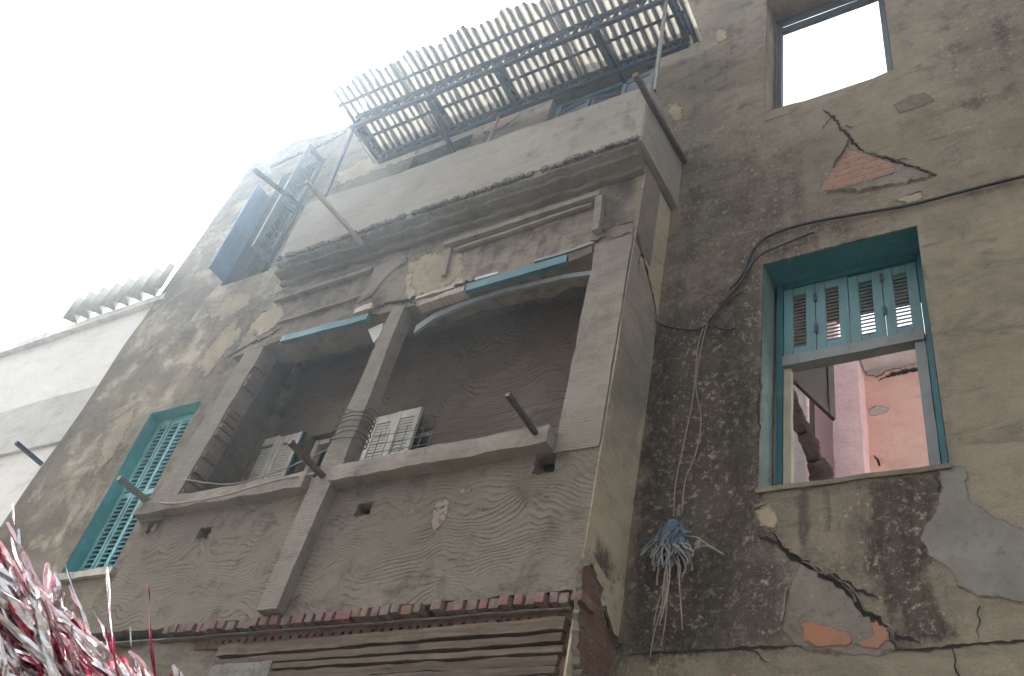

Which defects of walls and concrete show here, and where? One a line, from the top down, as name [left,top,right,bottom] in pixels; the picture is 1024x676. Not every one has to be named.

spalling [336,150,419,186]
spalling [817,137,936,204]
crack [823,109,937,176]
spalling [193,272,328,380]
crack [879,367,918,381]
spalling [94,401,139,476]
spalling [754,503,778,533]
spalling [571,550,625,676]
spalling [780,561,899,657]
crack [759,532,1024,676]